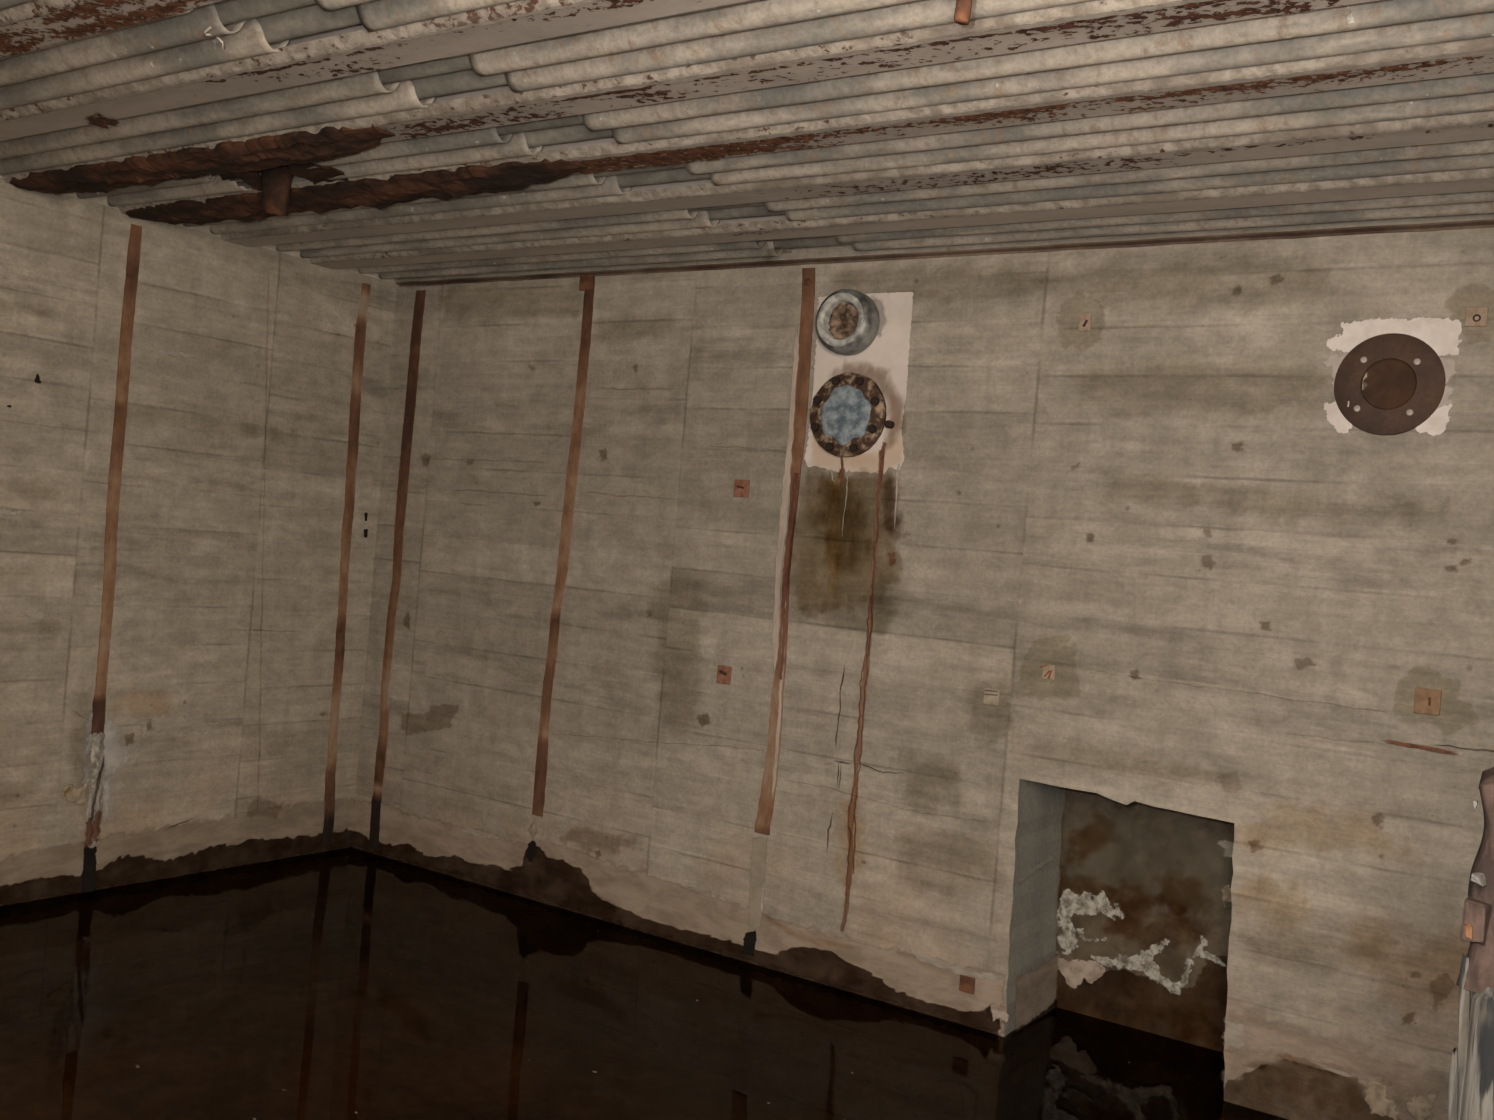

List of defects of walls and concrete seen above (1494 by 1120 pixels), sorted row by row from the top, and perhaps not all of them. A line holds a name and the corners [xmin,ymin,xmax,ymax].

rust [220,171,262,191]
rust [205,43,407,86]
rust [288,163,349,185]
rust [382,0,1343,139]
rust [573,56,1492,174]
rust [784,135,1376,199]
peeling [1324,353,1352,435]
peeling [1416,358,1457,436]
rust [840,442,895,932]
spalling [61,732,105,848]
water stain [0,712,1234,1037]
water stain [1222,1010,1449,1120]